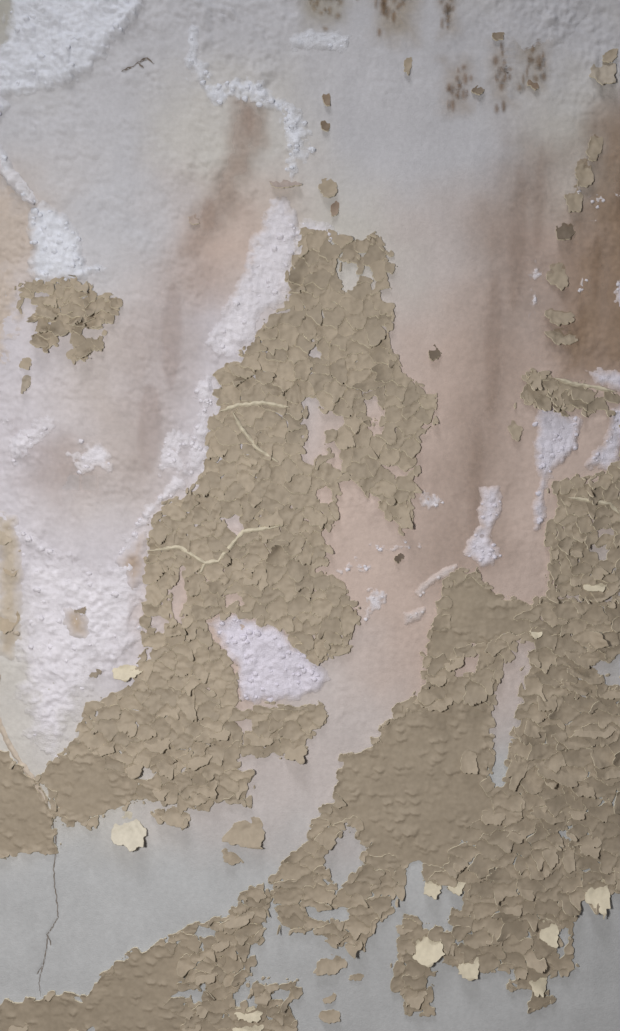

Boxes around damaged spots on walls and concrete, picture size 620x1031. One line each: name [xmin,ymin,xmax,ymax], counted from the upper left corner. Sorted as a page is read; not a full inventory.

water stain [0,0,143,116]
water stain [289,28,352,53]
water stain [11,182,108,284]
water stain [181,24,340,359]
peeling [428,344,442,361]
peeling [544,308,578,345]
peeling [507,368,620,442]
water stain [13,375,213,767]
peeling [0,178,439,866]
water stain [207,613,331,705]
peeling [0,452,620,1031]
crack [37,824,59,990]